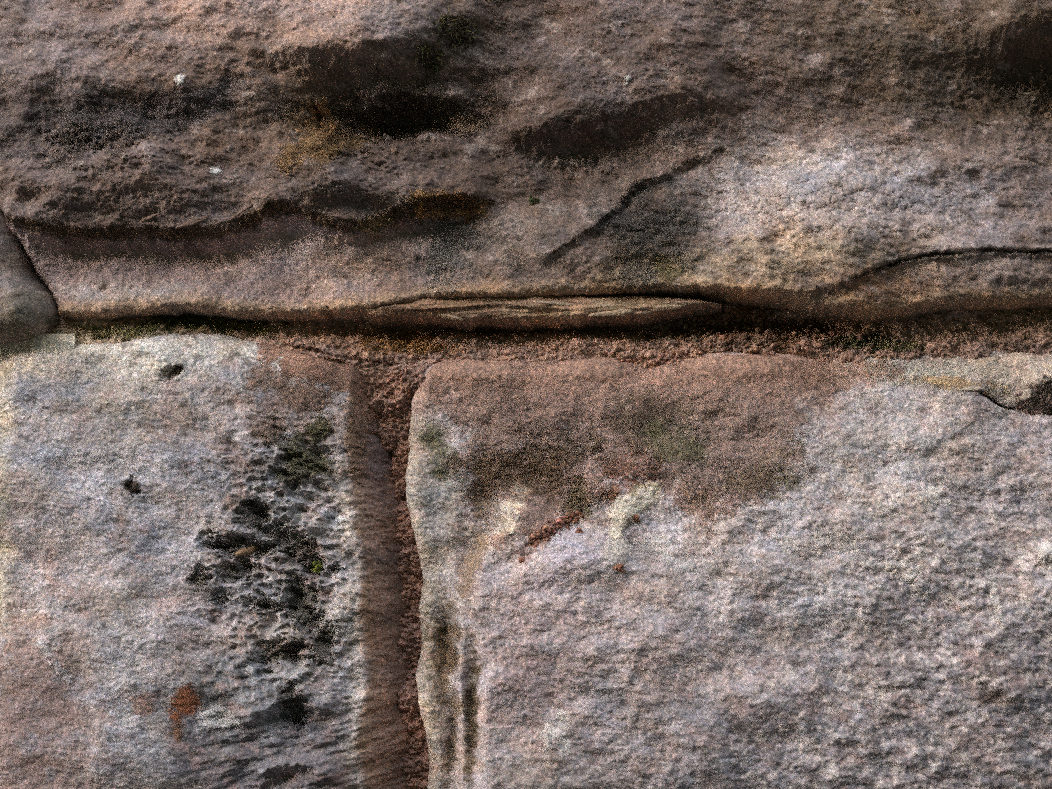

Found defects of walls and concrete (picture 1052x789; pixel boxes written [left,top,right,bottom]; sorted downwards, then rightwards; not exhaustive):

crack [853,247,1052,279]
water stain [51,449,144,471]
water stain [318,605,362,637]
water stain [201,706,244,729]